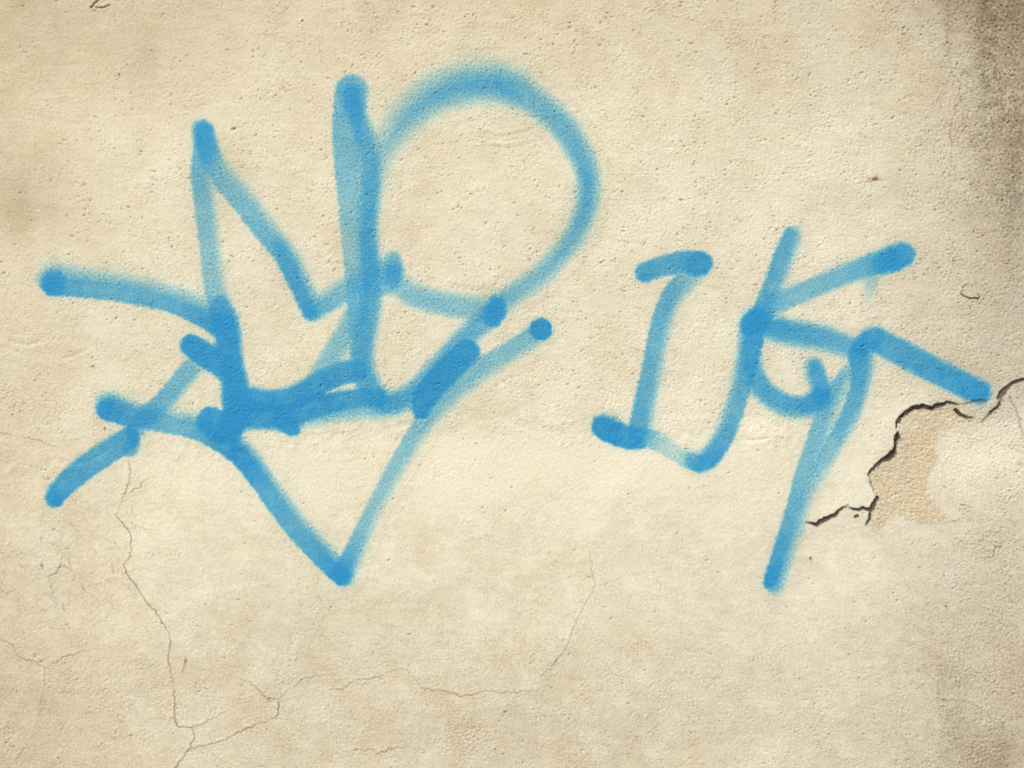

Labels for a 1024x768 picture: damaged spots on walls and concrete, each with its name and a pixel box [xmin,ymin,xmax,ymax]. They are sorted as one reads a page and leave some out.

crack [0,459,596,768]
flaking render [868,401,982,536]